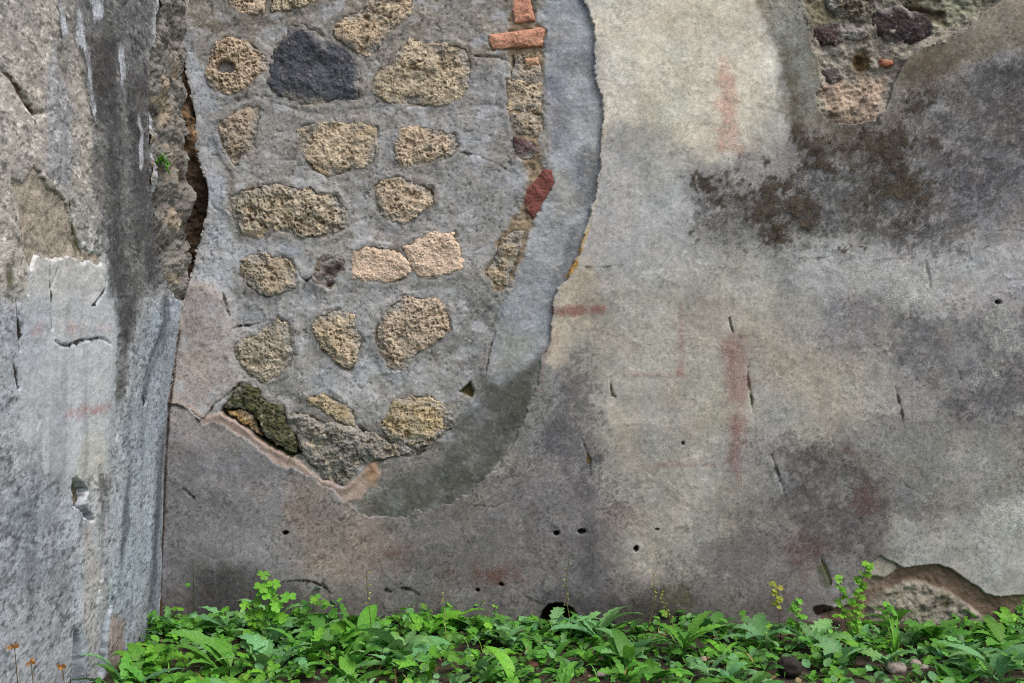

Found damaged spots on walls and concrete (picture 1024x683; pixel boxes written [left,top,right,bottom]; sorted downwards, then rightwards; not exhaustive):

flaking render [801,0,999,124]
crack [49,281,100,347]
leakage [60,0,161,350]
leakage [137,299,170,466]
crack [181,63,208,299]
flaking render [148,0,603,518]
leakage [121,483,141,583]
flaking render [820,556,1024,624]